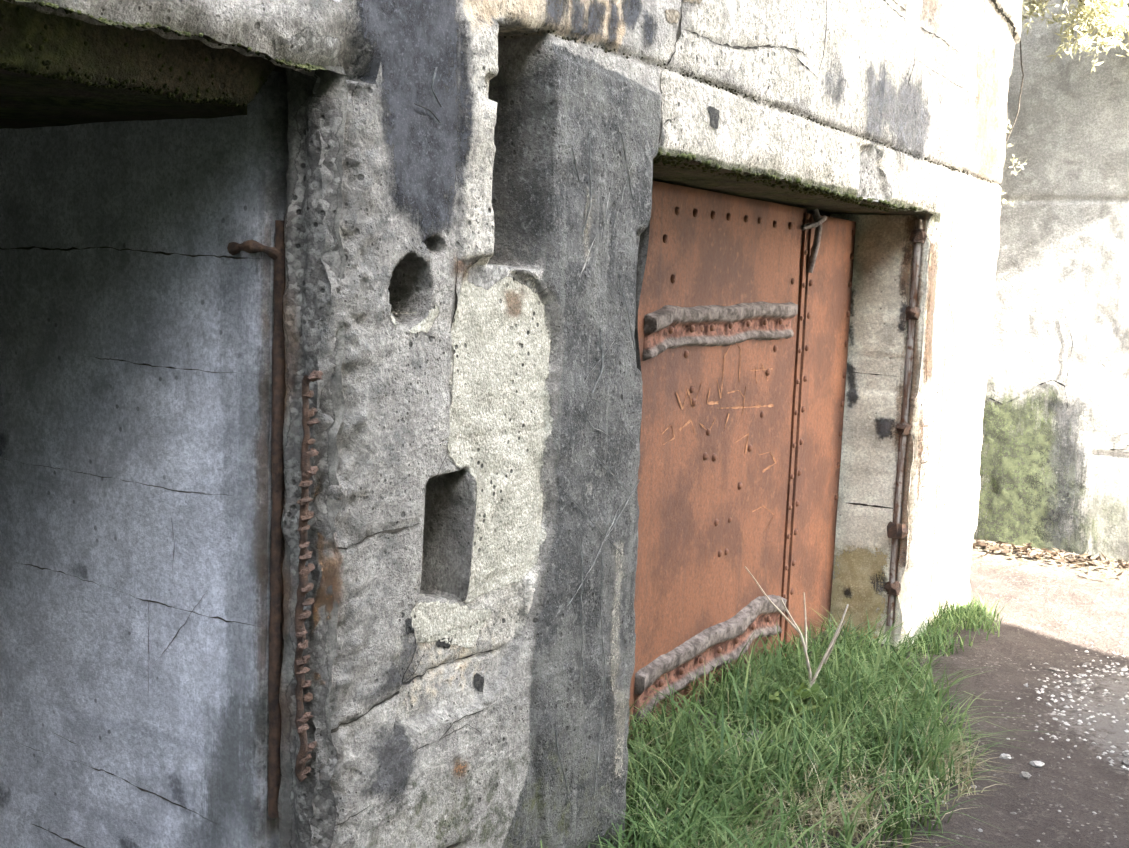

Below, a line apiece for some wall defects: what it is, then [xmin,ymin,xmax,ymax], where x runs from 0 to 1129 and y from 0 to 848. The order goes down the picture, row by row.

damp [355,0,477,248]
damp [543,0,657,47]
crack [659,1,827,141]
damp [825,63,846,106]
damp [866,0,930,164]
crack [884,0,978,98]
crack [983,0,1017,41]
rust [891,216,938,569]
crack [4,459,241,569]
crack [16,562,258,693]
rust [310,532,342,639]
crack [16,731,223,827]